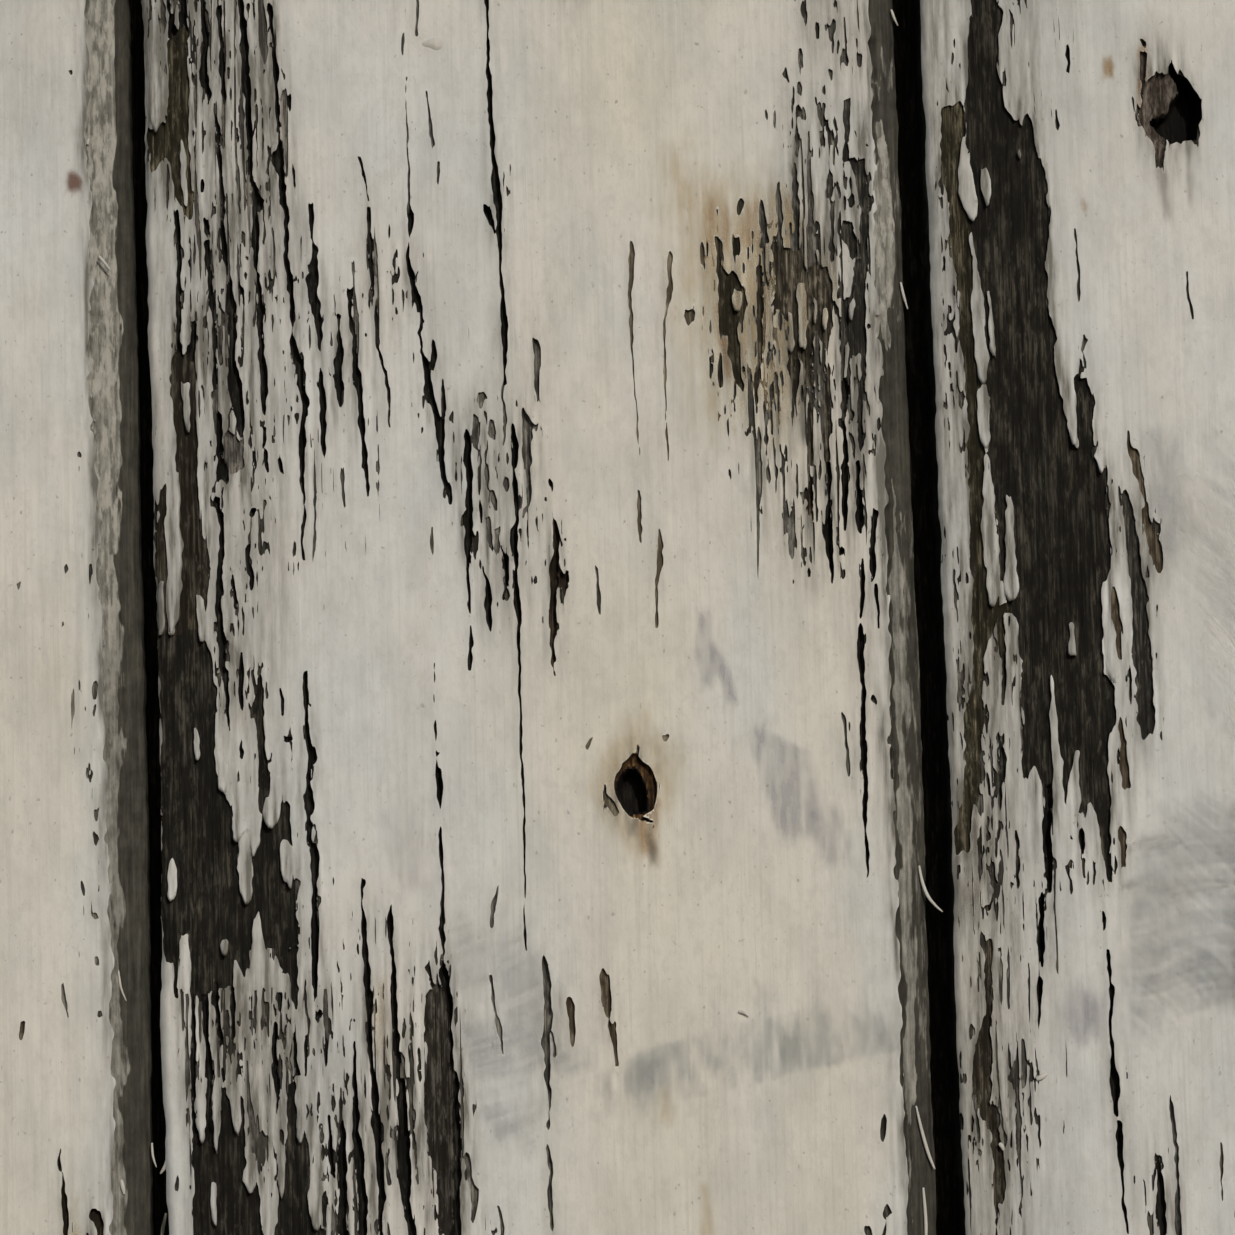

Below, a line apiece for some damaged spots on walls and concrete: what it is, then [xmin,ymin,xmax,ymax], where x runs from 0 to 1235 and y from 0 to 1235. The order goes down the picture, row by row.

peeling [146,0,477,1235]
crack [141,0,601,1235]
peeling [443,392,566,607]
peeling [693,0,881,582]
peeling [935,0,1164,1235]
peeling [566,997,576,1047]
peeling [599,968,619,1066]